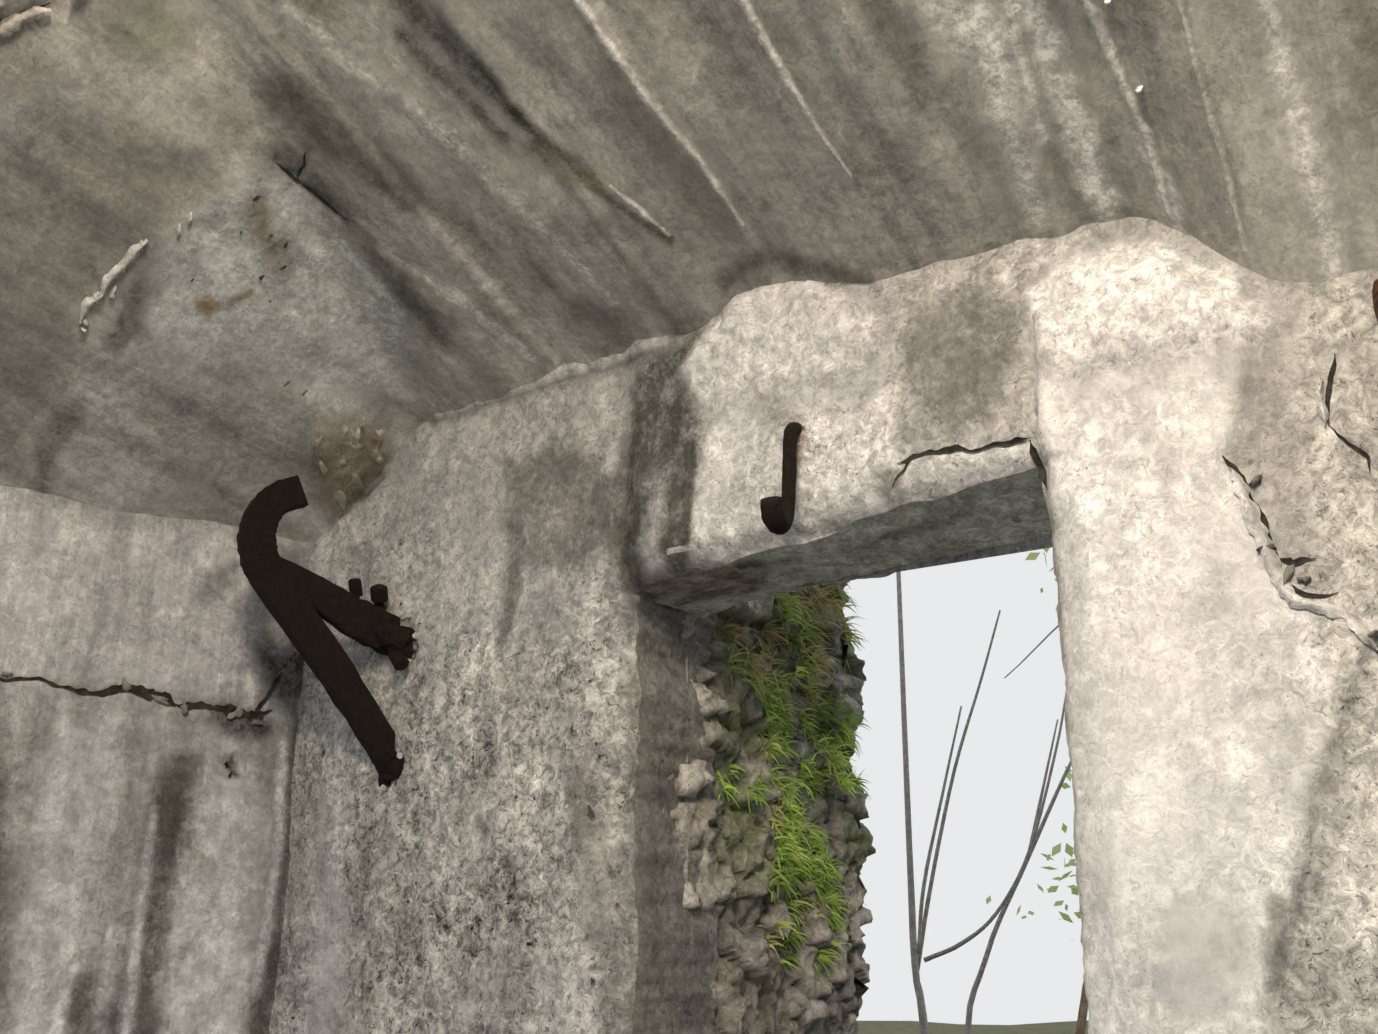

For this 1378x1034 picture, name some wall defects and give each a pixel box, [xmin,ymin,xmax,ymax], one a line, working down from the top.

crack [892,437,1047,488]
crack [1222,456,1378,654]
crack [0,671,283,725]